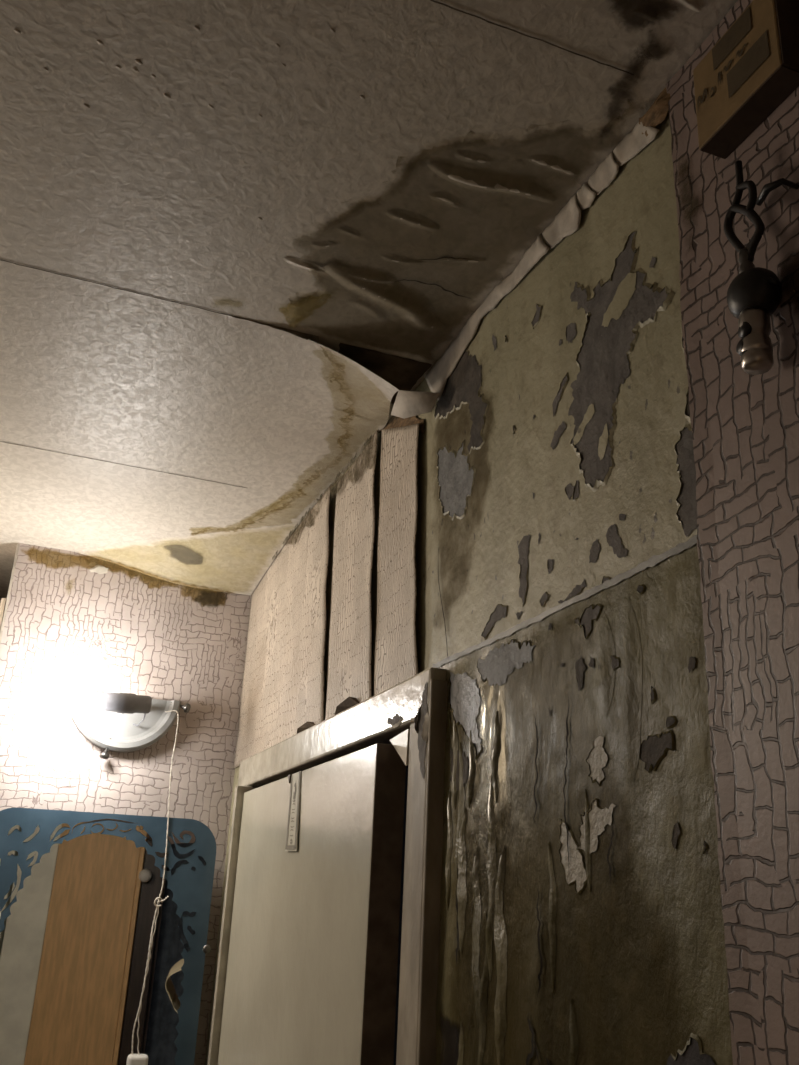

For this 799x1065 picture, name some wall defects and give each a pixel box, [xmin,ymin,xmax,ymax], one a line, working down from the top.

peeling [434,349,489,521]
peeling [551,231,675,501]
peeling [674,387,697,537]
peeling [445,533,540,1065]
peeling [539,579,586,608]
peeling [548,736,616,994]
peeling [574,604,603,640]
peeling [560,655,621,691]
peeling [589,514,628,563]
peeling [640,716,678,773]